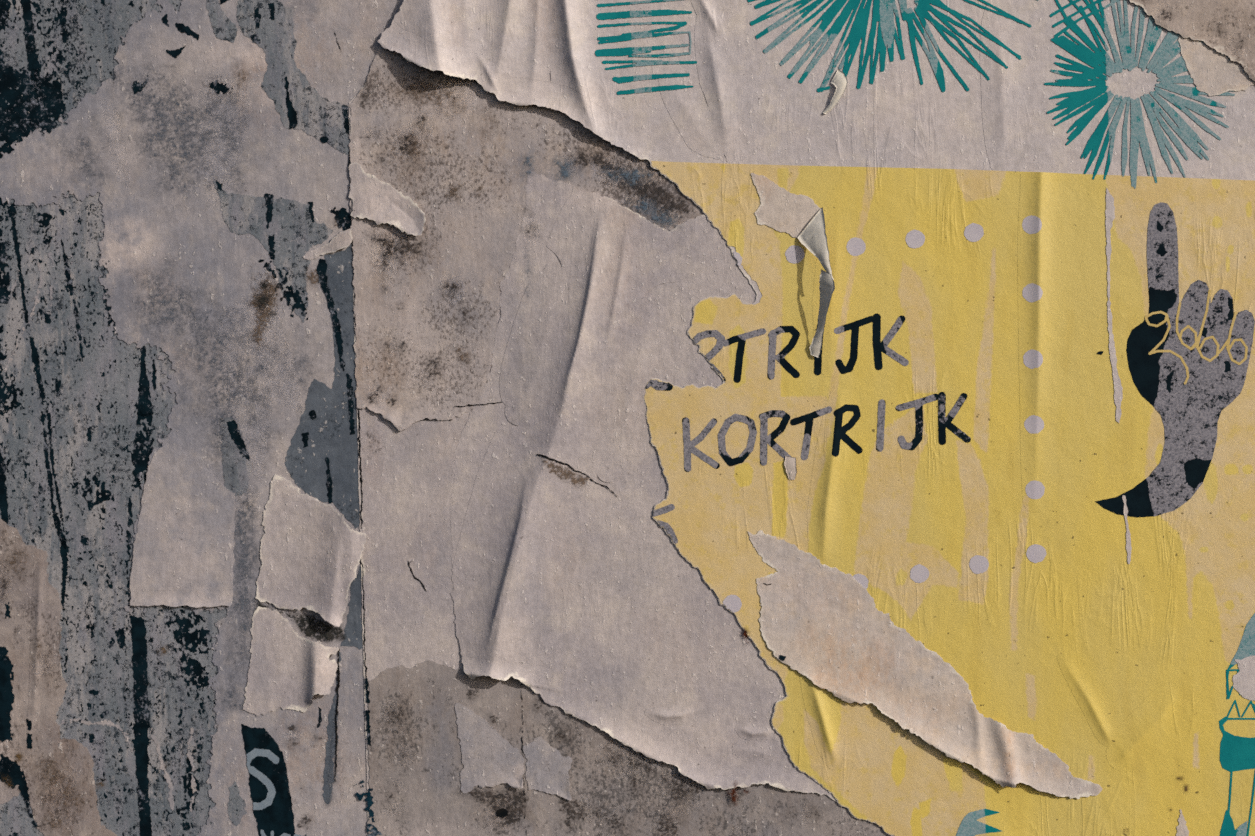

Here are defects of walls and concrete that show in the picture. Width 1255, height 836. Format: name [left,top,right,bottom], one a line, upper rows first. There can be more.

leakage [284,76,298,129]
peeling [378,20,676,179]
peeling [1129,0,1255,81]
leakage [306,45,704,435]
peeling [323,565,363,804]
peeling [748,530,1106,799]